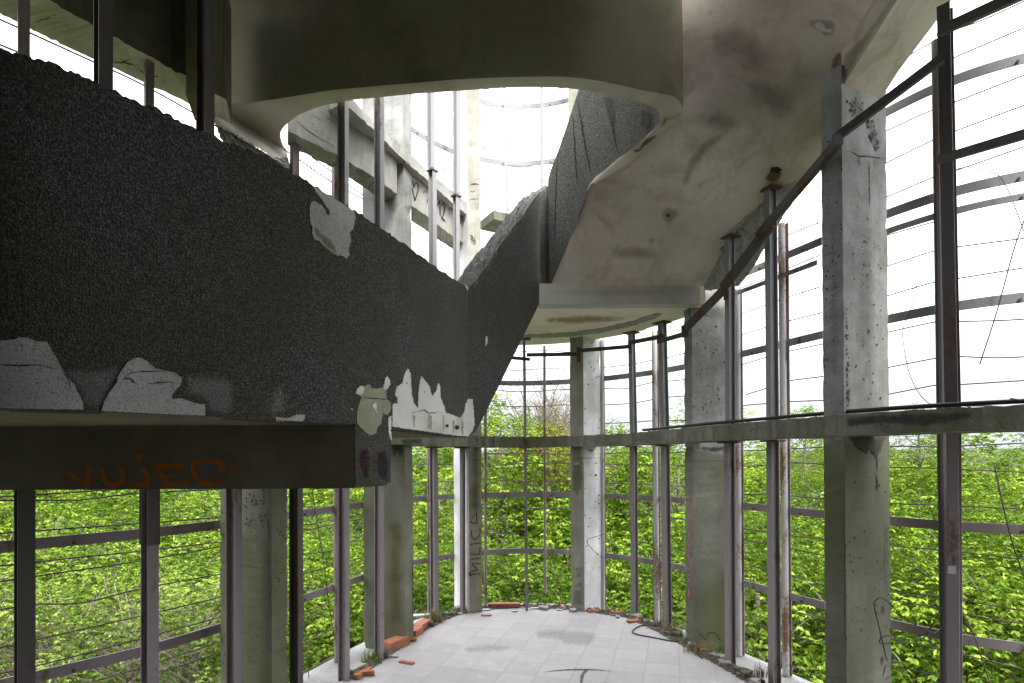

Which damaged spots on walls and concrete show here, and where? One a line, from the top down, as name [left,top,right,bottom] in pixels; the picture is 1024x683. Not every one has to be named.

peeling [309,186,356,260]
peeling [0,337,84,410]
peeling [102,357,205,416]
peeling [351,368,475,440]